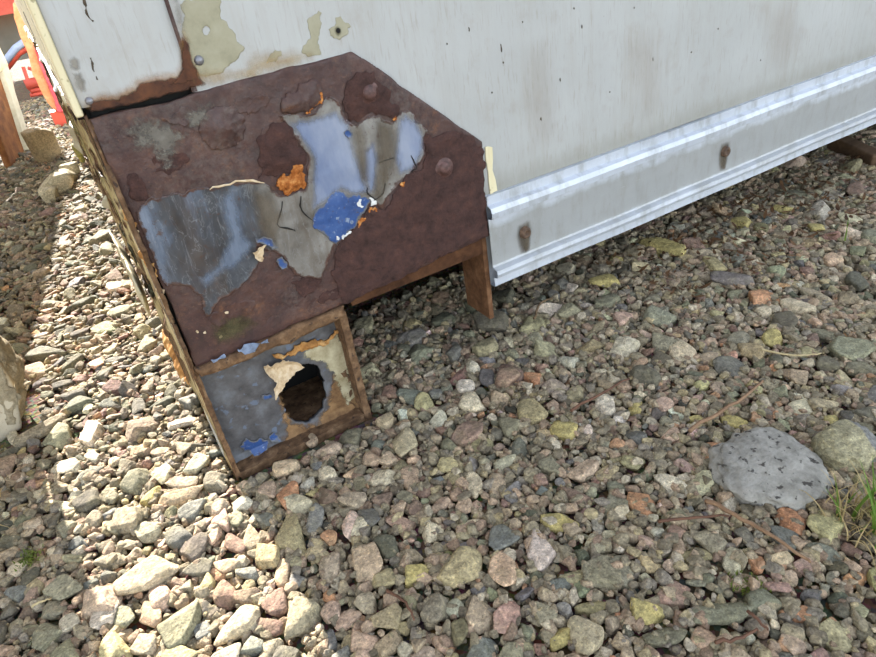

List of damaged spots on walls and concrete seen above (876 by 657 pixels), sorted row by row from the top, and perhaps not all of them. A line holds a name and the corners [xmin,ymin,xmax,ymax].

corrosion [90,38,205,111]
peeling [180,0,245,77]
peeling [302,11,351,57]
corrosion [256,79,323,196]
peeling [122,96,428,317]
corrosion [331,131,488,304]
corrosion [81,119,234,475]